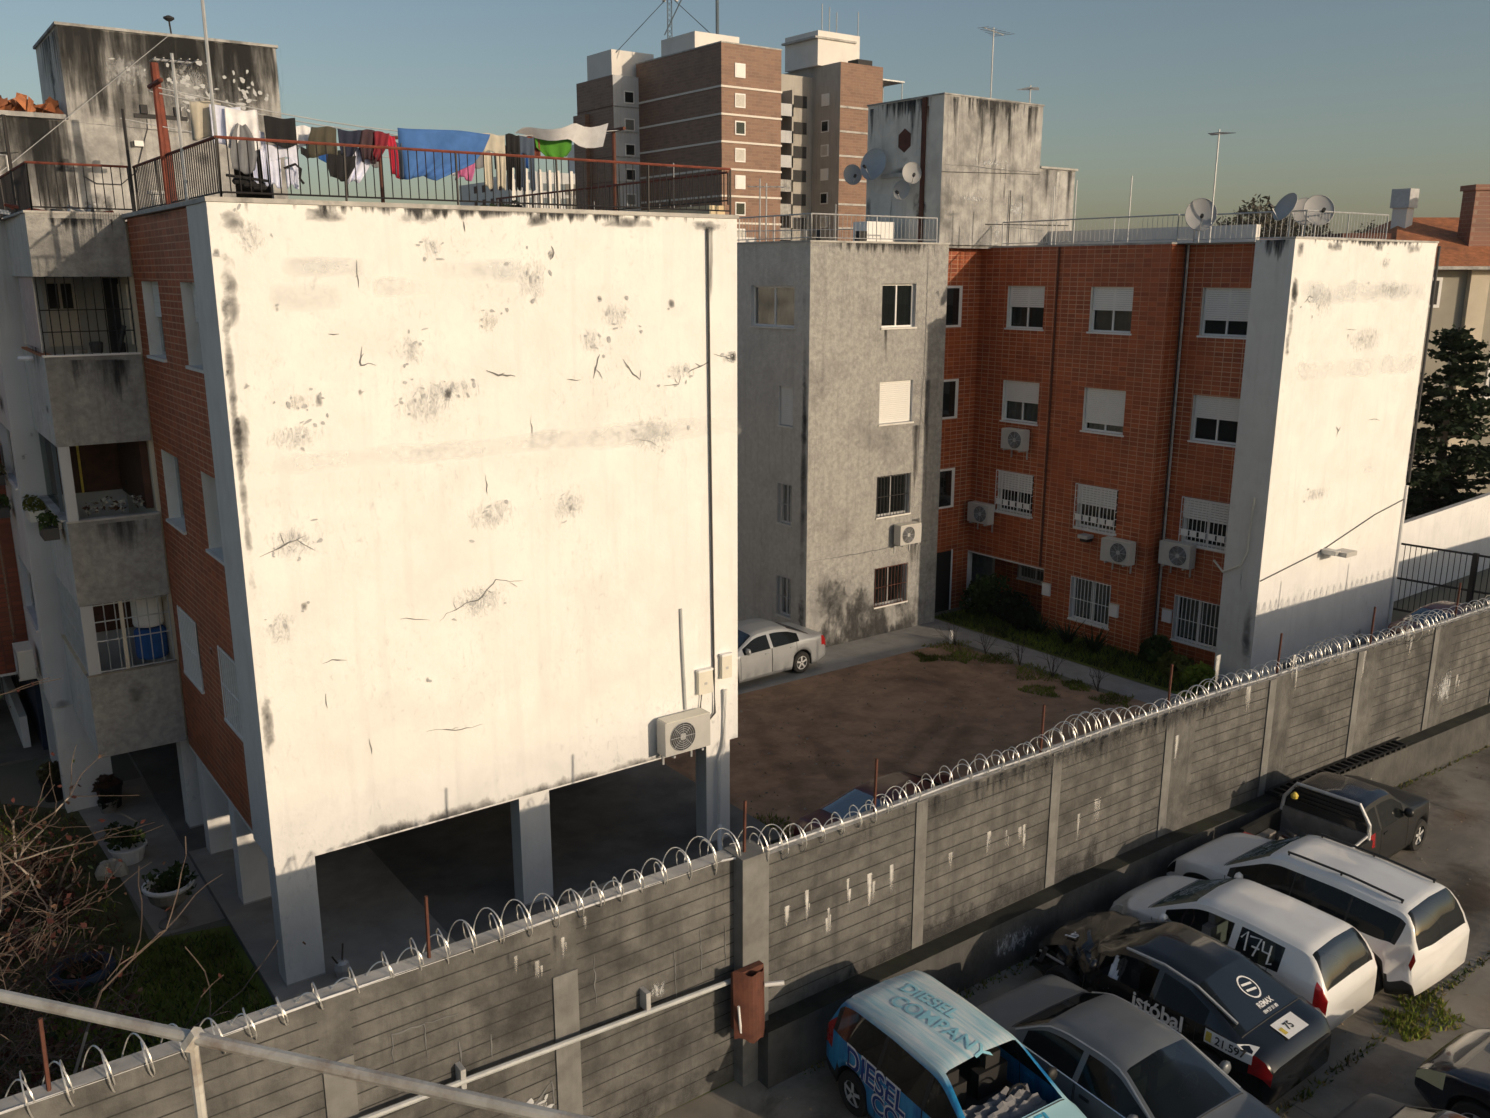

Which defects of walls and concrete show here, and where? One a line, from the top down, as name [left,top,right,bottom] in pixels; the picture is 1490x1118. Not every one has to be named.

damp [41,26,272,117]
damp [0,117,112,227]
damp [231,396,245,465]
crack [260,534,314,557]
crack [403,579,523,621]
damp [823,583,915,647]